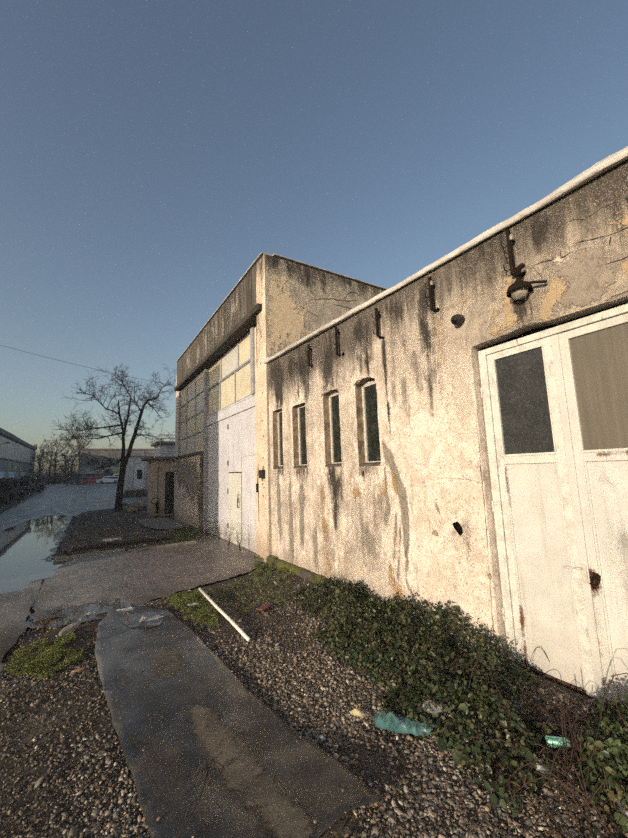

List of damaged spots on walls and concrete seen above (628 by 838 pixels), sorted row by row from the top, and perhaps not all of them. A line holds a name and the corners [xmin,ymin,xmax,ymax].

peeling [266,270,313,364]
water stain [271,256,325,290]
water stain [418,282,431,352]
peeling [490,276,567,338]
crack [528,196,628,279]
spalling [604,260,628,303]
water stain [270,333,337,421]
water stain [382,340,432,426]
water stain [276,468,318,567]
water stain [327,467,342,528]
water stain [345,517,379,589]
water stain [373,440,418,606]